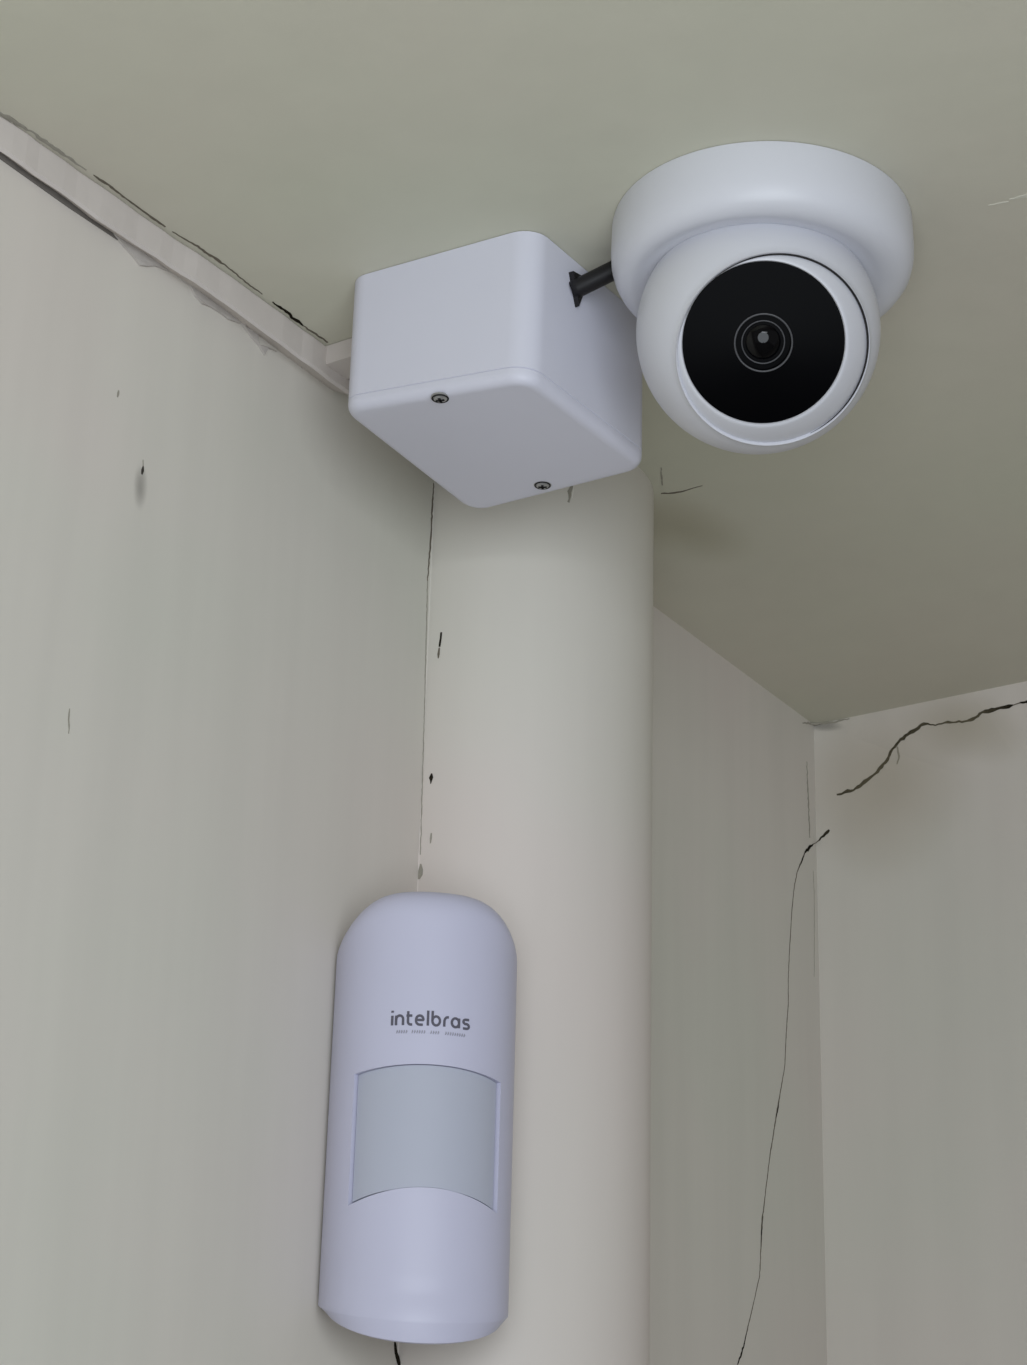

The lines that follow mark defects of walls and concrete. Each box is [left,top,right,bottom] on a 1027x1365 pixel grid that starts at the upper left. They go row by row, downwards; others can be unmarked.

crack [0,112,328,343]
crack [737,700,1027,1365]